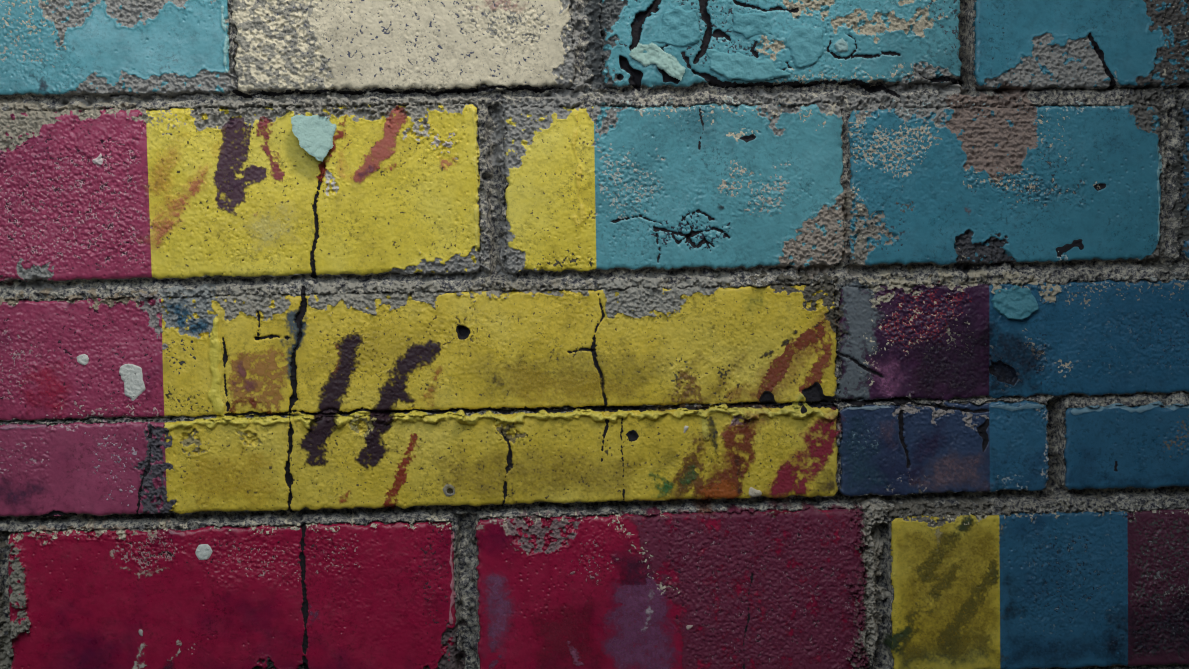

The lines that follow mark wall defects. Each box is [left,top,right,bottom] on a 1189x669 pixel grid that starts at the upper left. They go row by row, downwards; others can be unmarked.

peeling [0,0,686,196]
crack [629,0,962,150]
spalling [706,0,1189,272]
peeling [77,354,89,366]
peeling [119,364,145,401]
peeling [0,258,291,350]
peeling [307,218,733,319]
crack [222,165,989,669]
peeling [749,187,1061,414]
peeling [506,508,584,554]